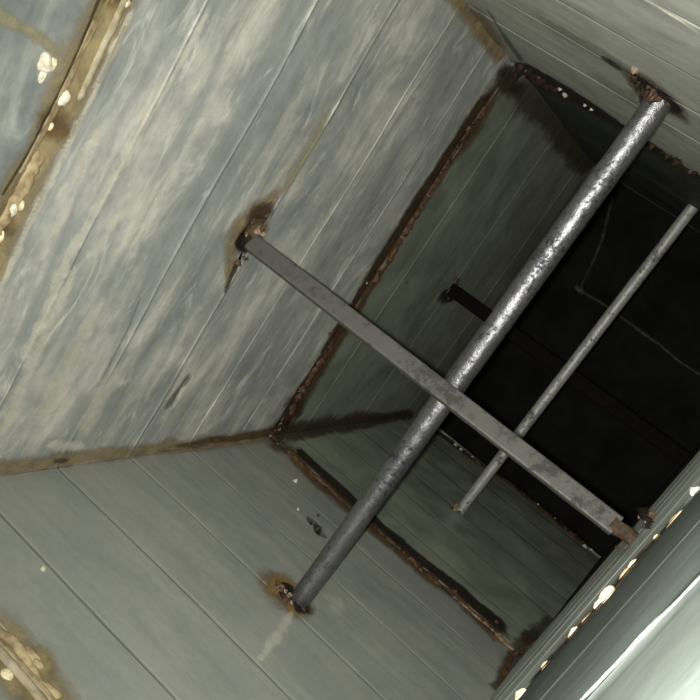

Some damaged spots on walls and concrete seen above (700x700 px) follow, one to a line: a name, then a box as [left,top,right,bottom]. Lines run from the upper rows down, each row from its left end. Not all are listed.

corrosion [0,0,131,278]
corrosion [353,0,625,313]
corrosion [644,141,699,176]
corrosion [0,328,413,513]
spalling [634,506,655,529]
corrosion [0,619,67,700]